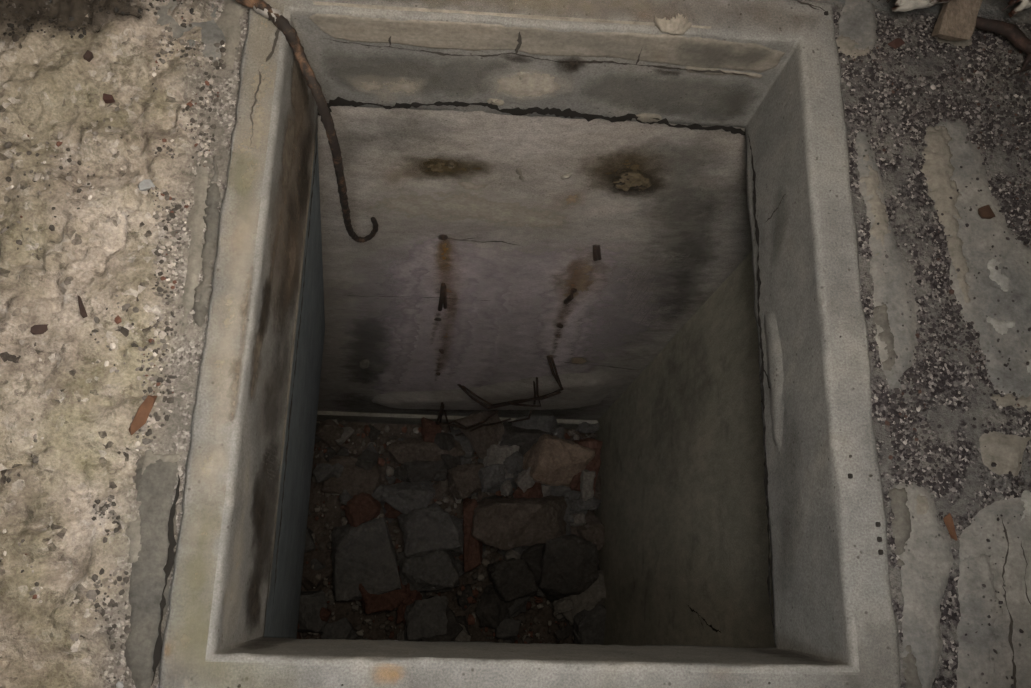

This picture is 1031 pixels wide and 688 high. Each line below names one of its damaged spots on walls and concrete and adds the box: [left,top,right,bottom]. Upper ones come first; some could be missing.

crack [324,32,749,76]
leakage [352,244,607,393]
crack [270,97,786,638]
crack [151,475,180,686]
leakage [247,453,277,626]
crack [1002,520,1031,688]